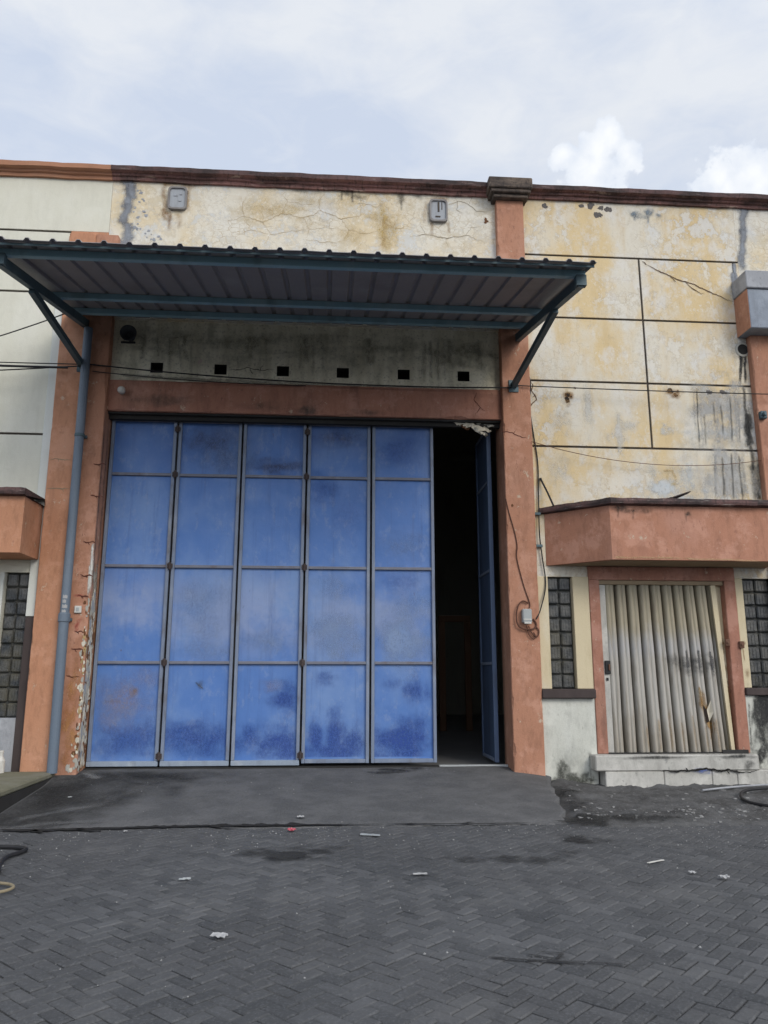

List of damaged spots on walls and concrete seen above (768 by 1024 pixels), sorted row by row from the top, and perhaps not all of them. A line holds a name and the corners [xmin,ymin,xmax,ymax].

leakage [118,181,136,244]
crack [236,198,487,245]
spalling [578,202,612,218]
crack [642,261,733,302]
leakage [731,209,748,294]
spalling [454,422,494,437]
leakage [692,356,760,498]
peeling [65,545,97,773]
leakage [729,680,768,769]